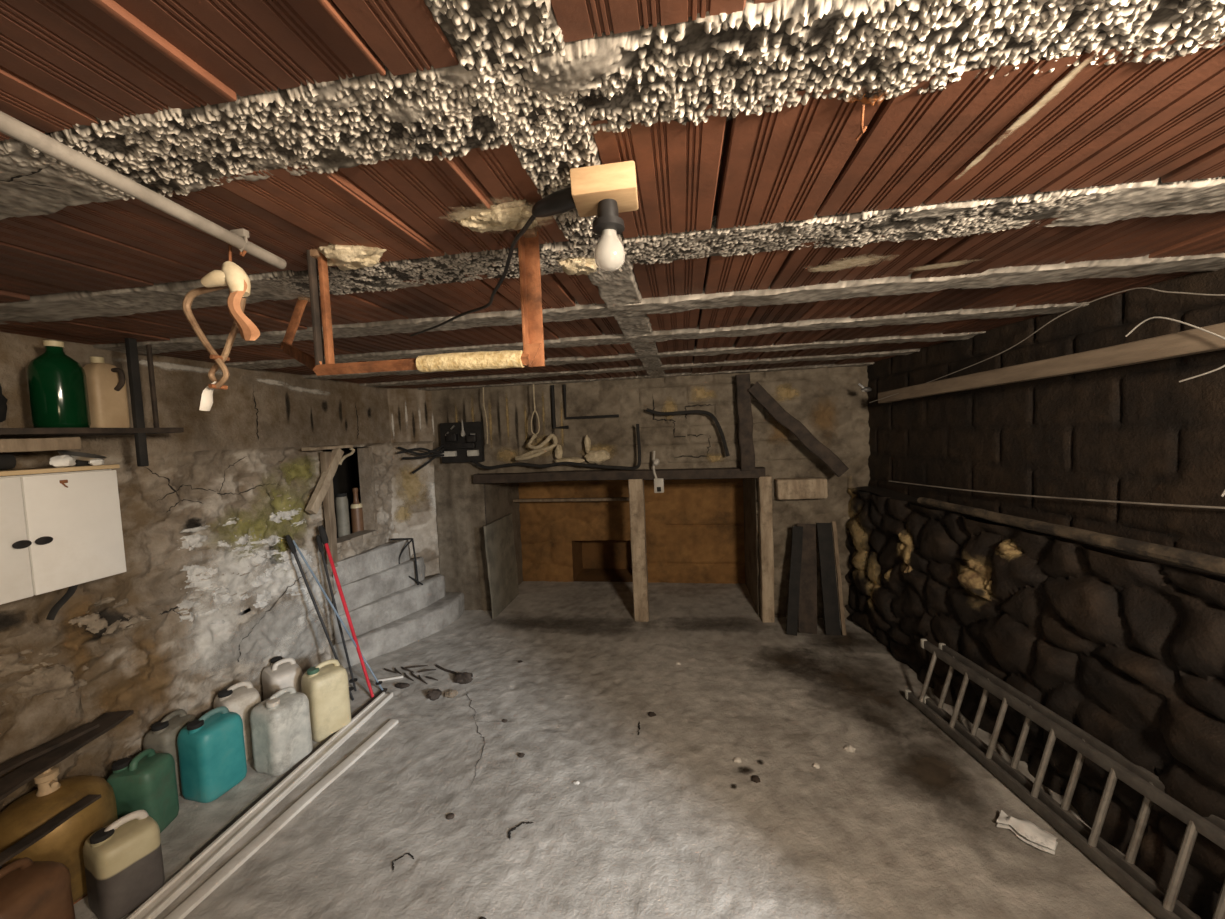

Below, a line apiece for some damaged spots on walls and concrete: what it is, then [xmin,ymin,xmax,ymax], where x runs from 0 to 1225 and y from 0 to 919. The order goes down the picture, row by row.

flaking render [177,508,313,625]
crack [238,573,306,662]